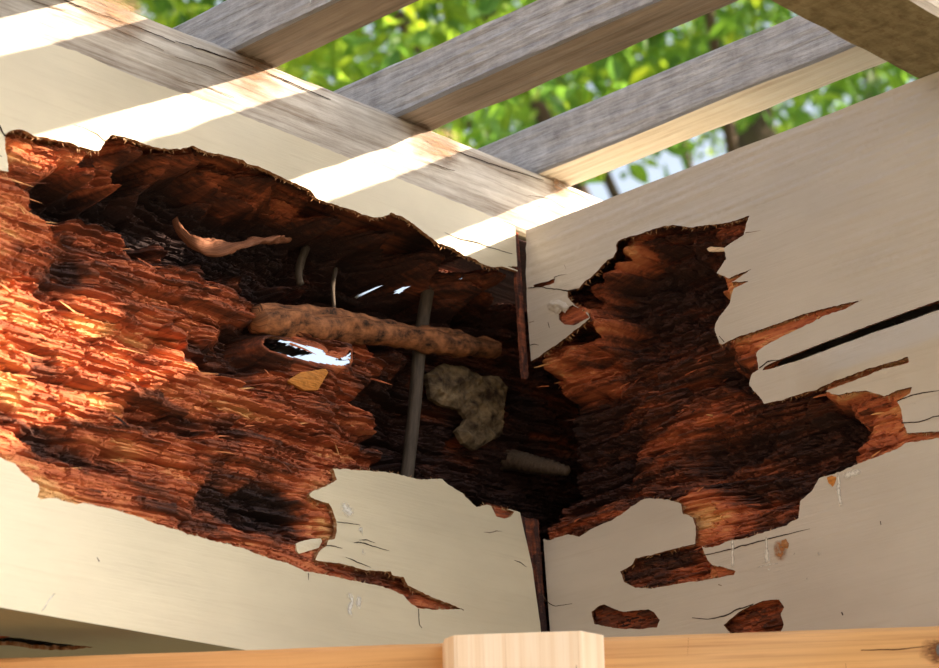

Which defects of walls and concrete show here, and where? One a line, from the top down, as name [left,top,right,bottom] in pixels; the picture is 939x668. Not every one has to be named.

spalling [0,130,939,633]